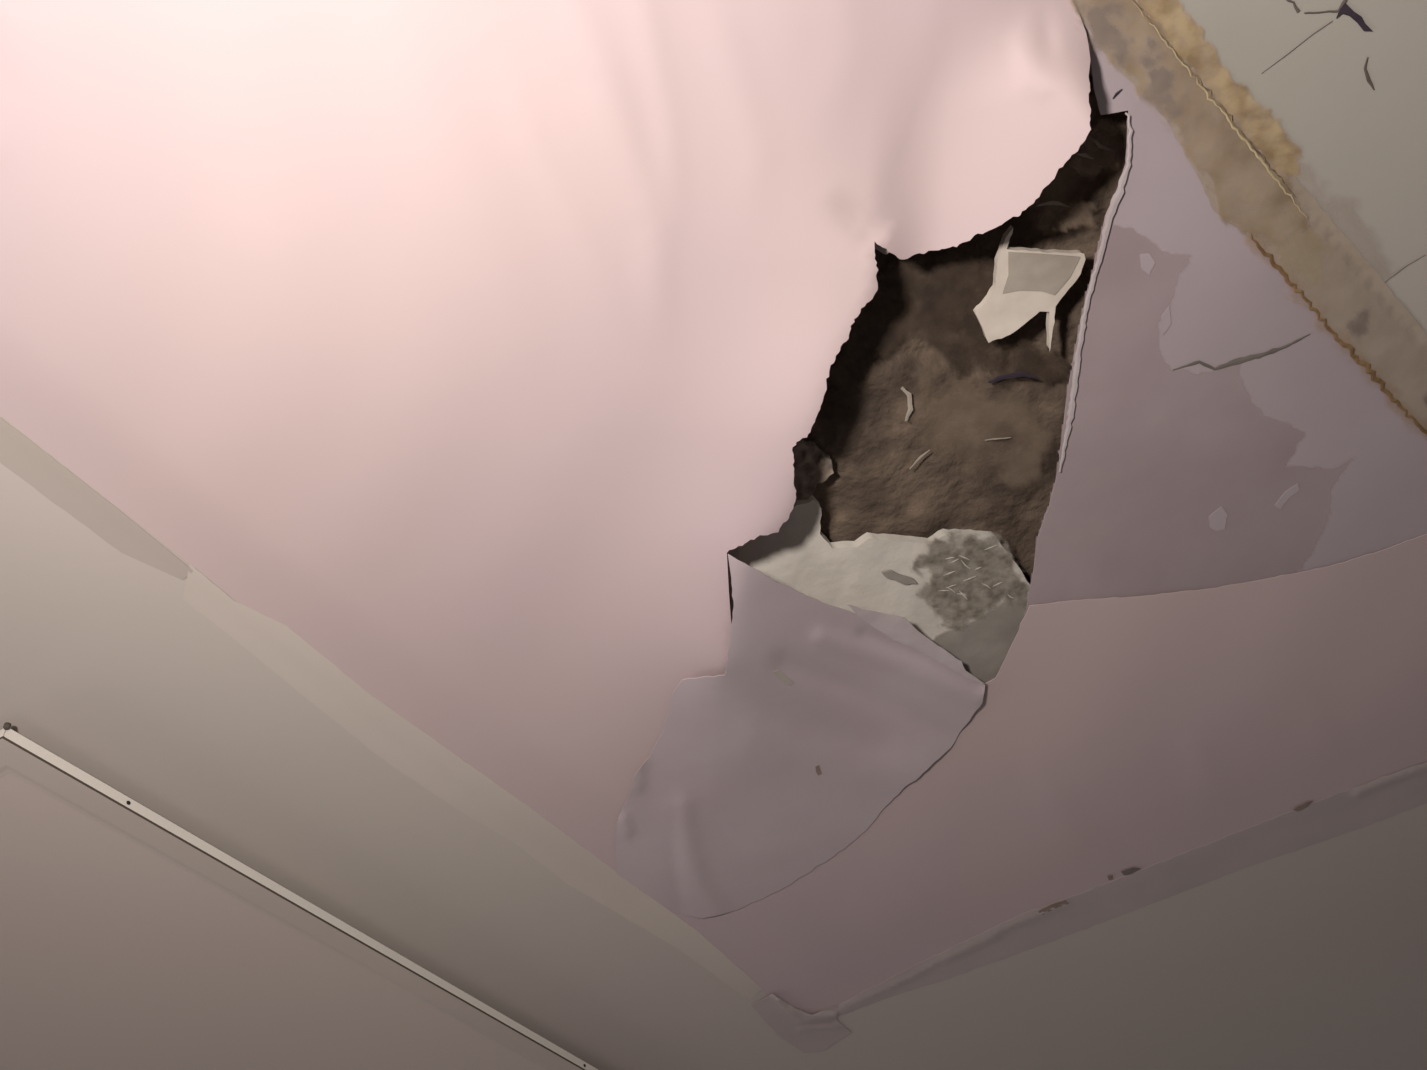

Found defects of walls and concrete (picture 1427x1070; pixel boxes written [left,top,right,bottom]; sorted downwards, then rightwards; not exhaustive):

damp [1071,0,1322,258]
crack [1261,0,1375,90]
peeling [739,22,1427,684]